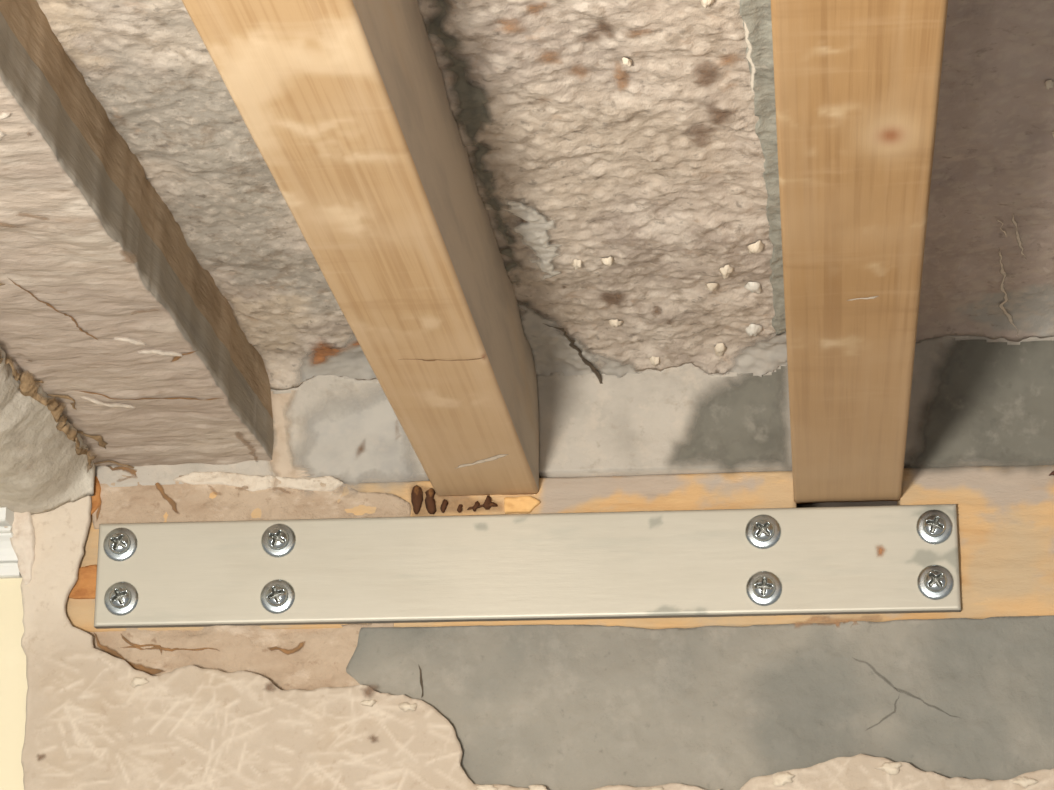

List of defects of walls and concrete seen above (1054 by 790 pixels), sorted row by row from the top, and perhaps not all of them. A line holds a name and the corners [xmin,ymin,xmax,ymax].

water stain [586,24,612,42]
water stain [697,57,732,85]
water stain [695,108,727,144]
water stain [603,294,622,305]
crack [546,324,603,384]
water stain [673,366,788,470]
flaking render [773,772,795,786]
flaking render [875,762,903,775]